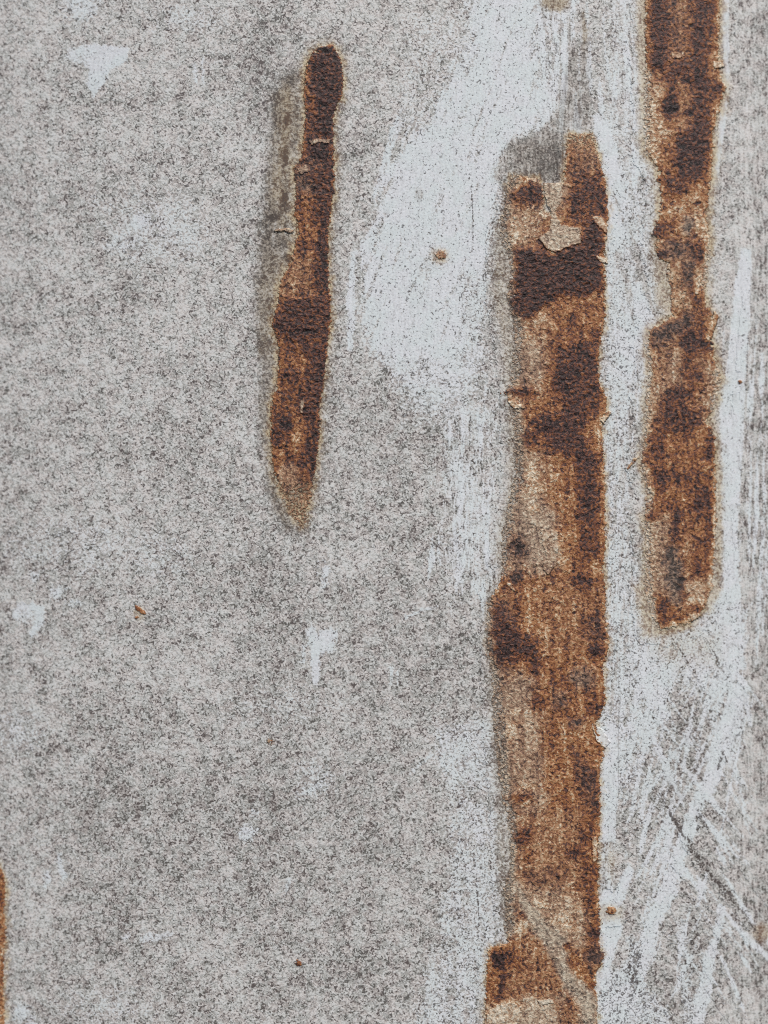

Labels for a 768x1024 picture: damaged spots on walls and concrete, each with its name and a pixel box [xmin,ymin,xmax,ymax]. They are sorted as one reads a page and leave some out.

rust [242,29,361,545]
rust [475,0,743,1024]